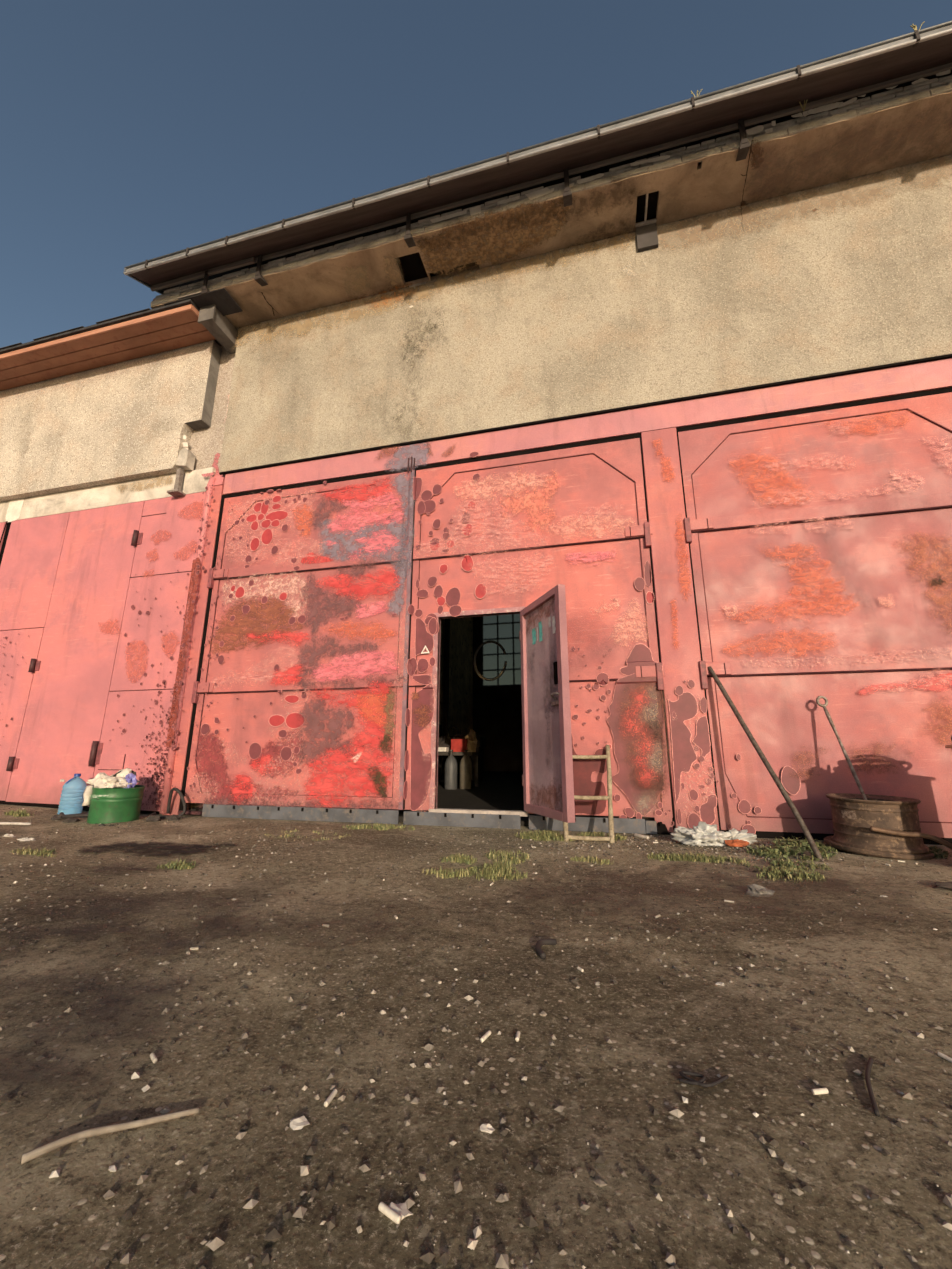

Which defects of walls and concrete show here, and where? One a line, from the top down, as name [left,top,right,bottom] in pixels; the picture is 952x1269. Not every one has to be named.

spalling [416,173,604,276]
peeling [630,155,670,166]
damp [665,110,952,248]
peeling [791,94,866,117]
peeling [191,469,631,812]
peeling [571,561,762,834]